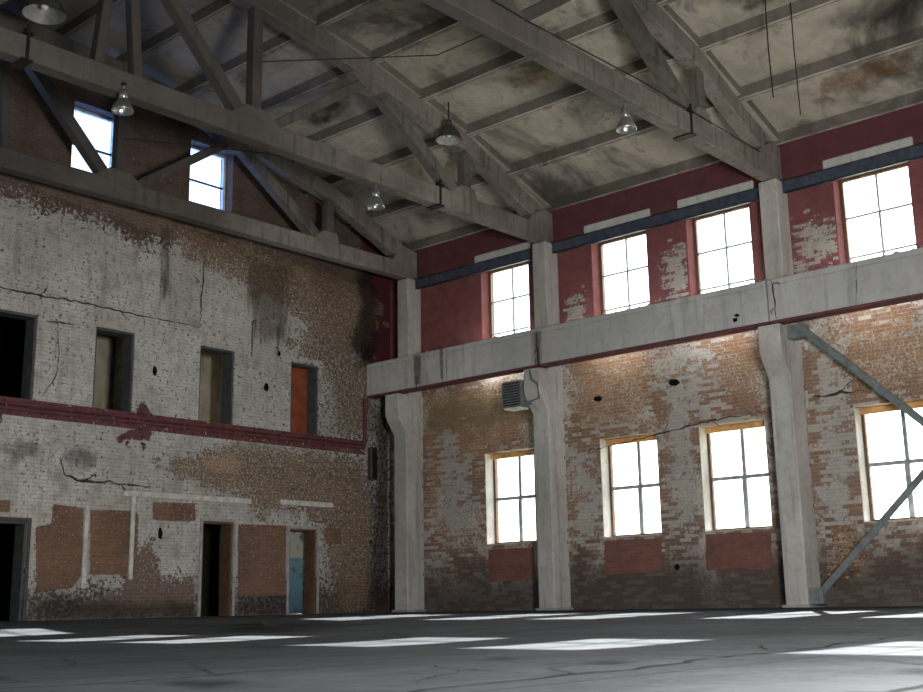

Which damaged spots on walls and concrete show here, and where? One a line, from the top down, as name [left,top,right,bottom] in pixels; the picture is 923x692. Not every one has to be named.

peeling [658,239,689,301]
peeling [790,209,839,273]
crack [0,258,205,398]
peeling [28,179,390,620]
crack [60,459,150,491]
crack [407,631,923,692]